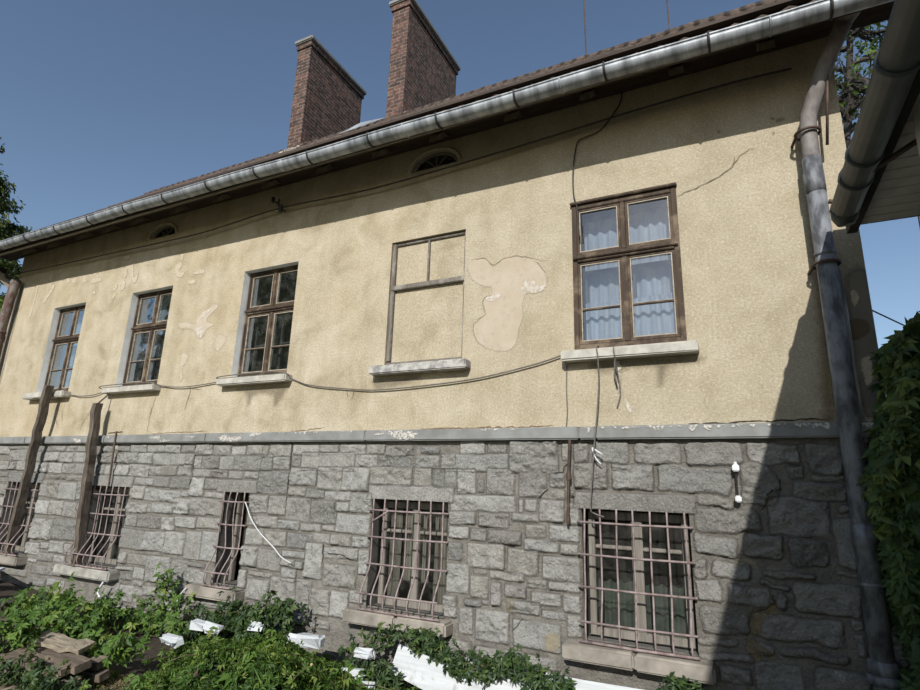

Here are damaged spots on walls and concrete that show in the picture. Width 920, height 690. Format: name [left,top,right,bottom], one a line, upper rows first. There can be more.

crack [678,149,755,196]
flaking render [467,255,547,352]
peeling [587,424,720,432]